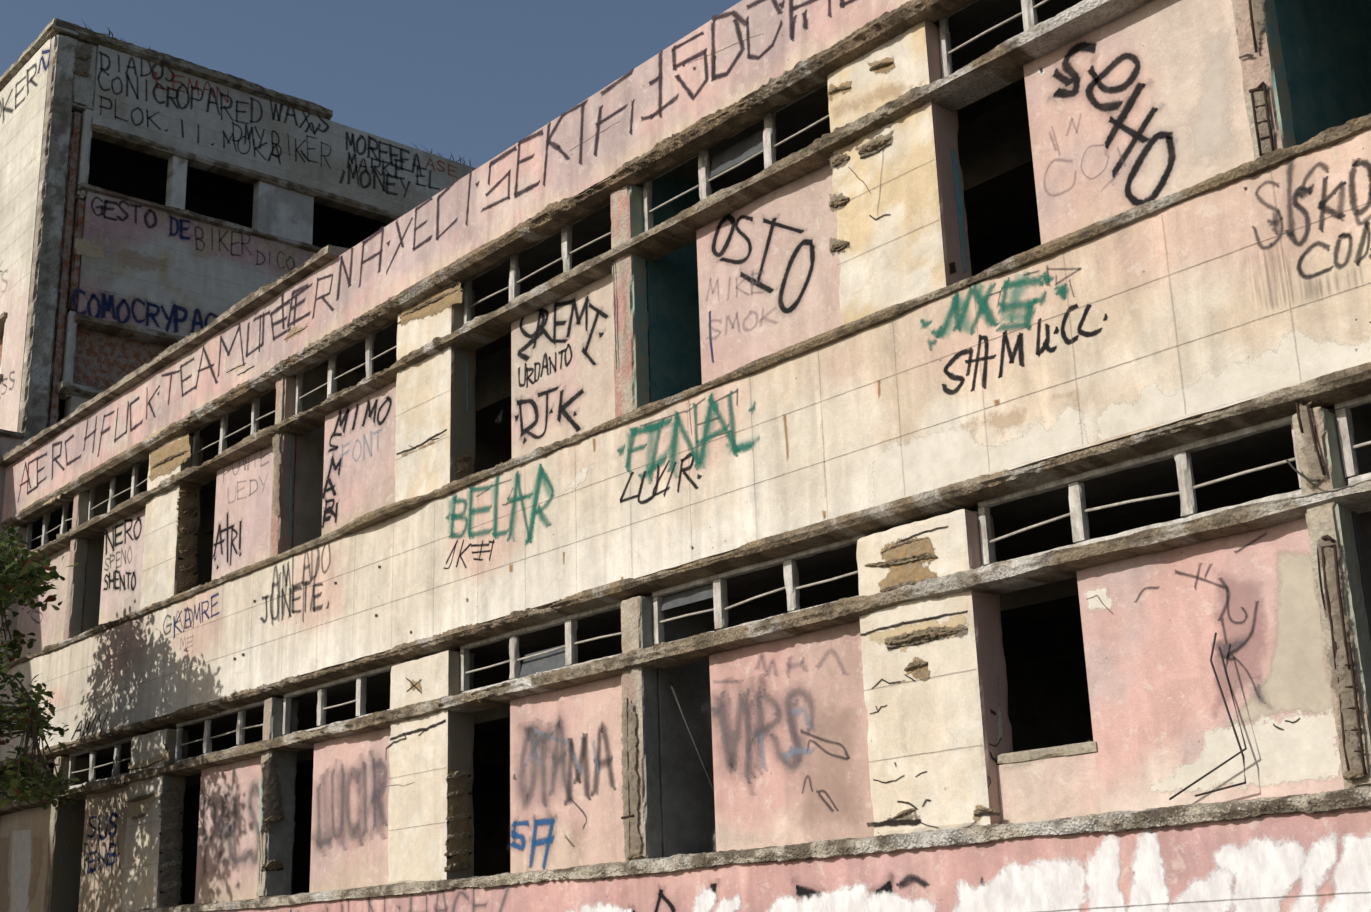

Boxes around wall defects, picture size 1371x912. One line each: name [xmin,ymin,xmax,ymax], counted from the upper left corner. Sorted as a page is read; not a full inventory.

spalling [1249,81,1275,157]
spalling [141,421,198,593]
spalling [864,526,948,592]
peeling [860,610,969,689]
peeling [1150,535,1366,793]
spalling [126,787,183,905]
spalling [444,764,474,873]